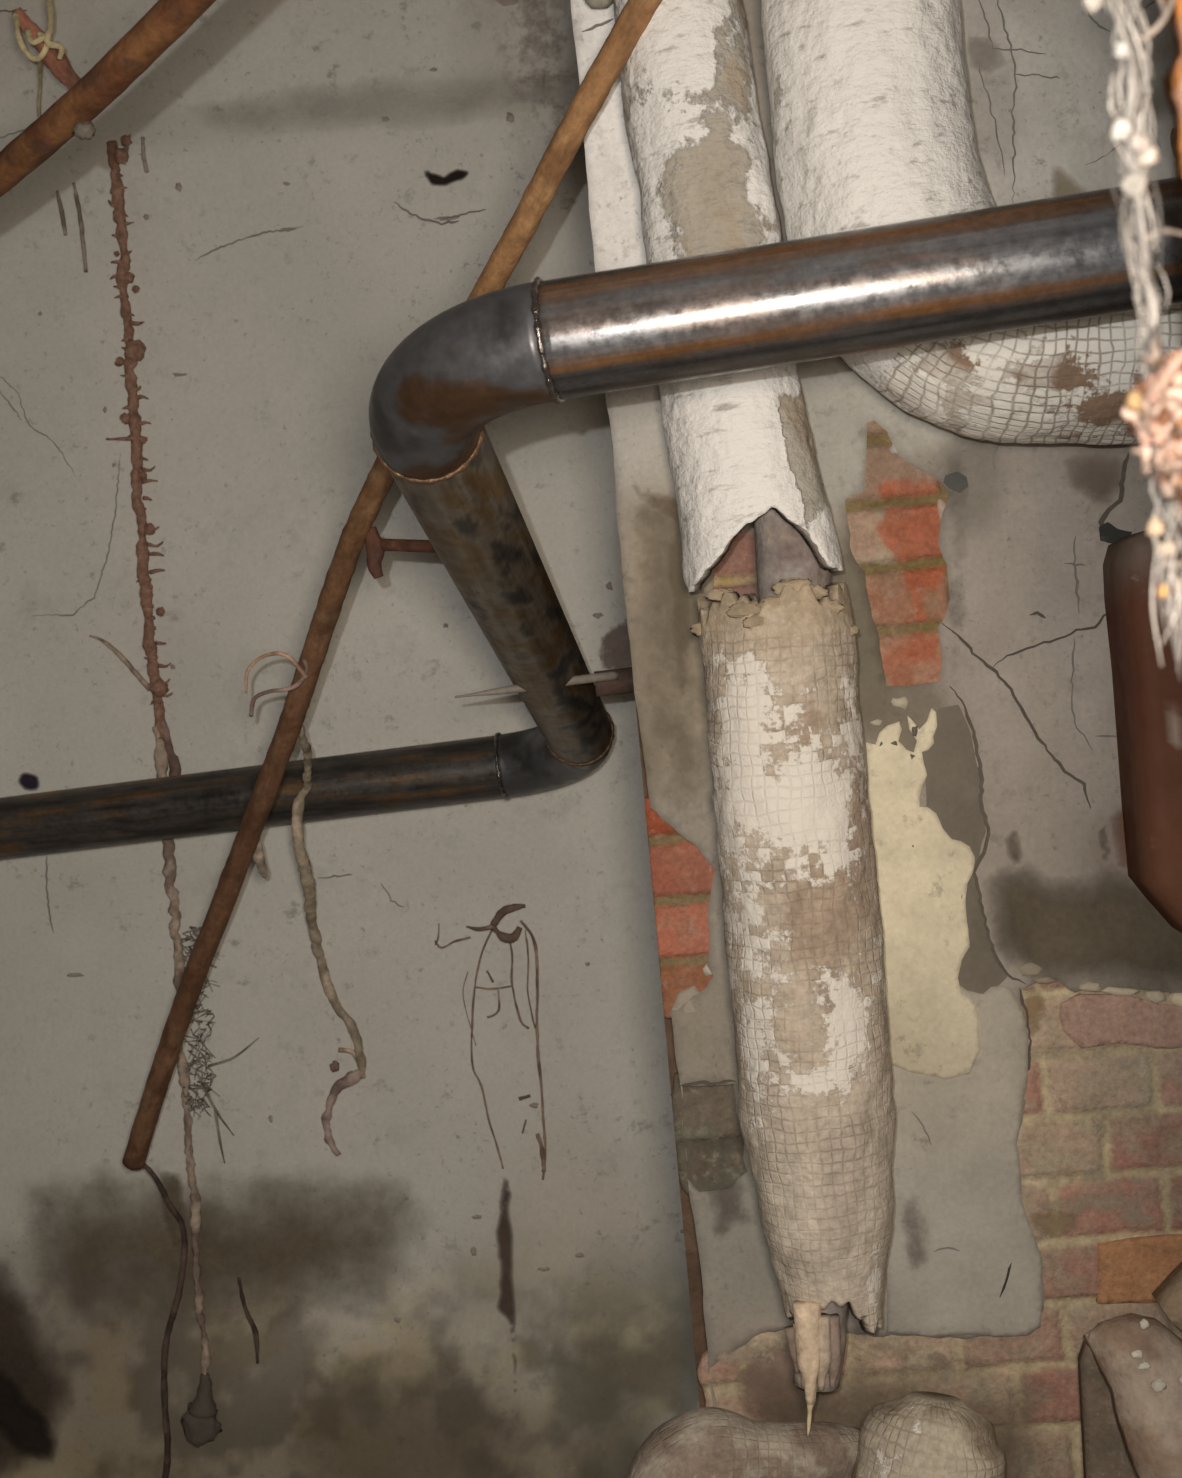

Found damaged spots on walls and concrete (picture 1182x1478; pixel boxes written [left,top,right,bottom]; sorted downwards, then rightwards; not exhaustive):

crack [978,0,1060,204]
crack [1082,0,1161,165]
crack [34,459,120,617]
crack [942,452,1129,809]
spalling [645,797,715,1019]
crack [950,686,1032,1071]
spalling [816,420,1182,1478]
spalling [672,1072,747,1194]
leakage [56,1177,390,1297]
leakage [497,1183,514,1324]
leakage [0,1281,61,1425]
spalling [697,1329,788,1422]